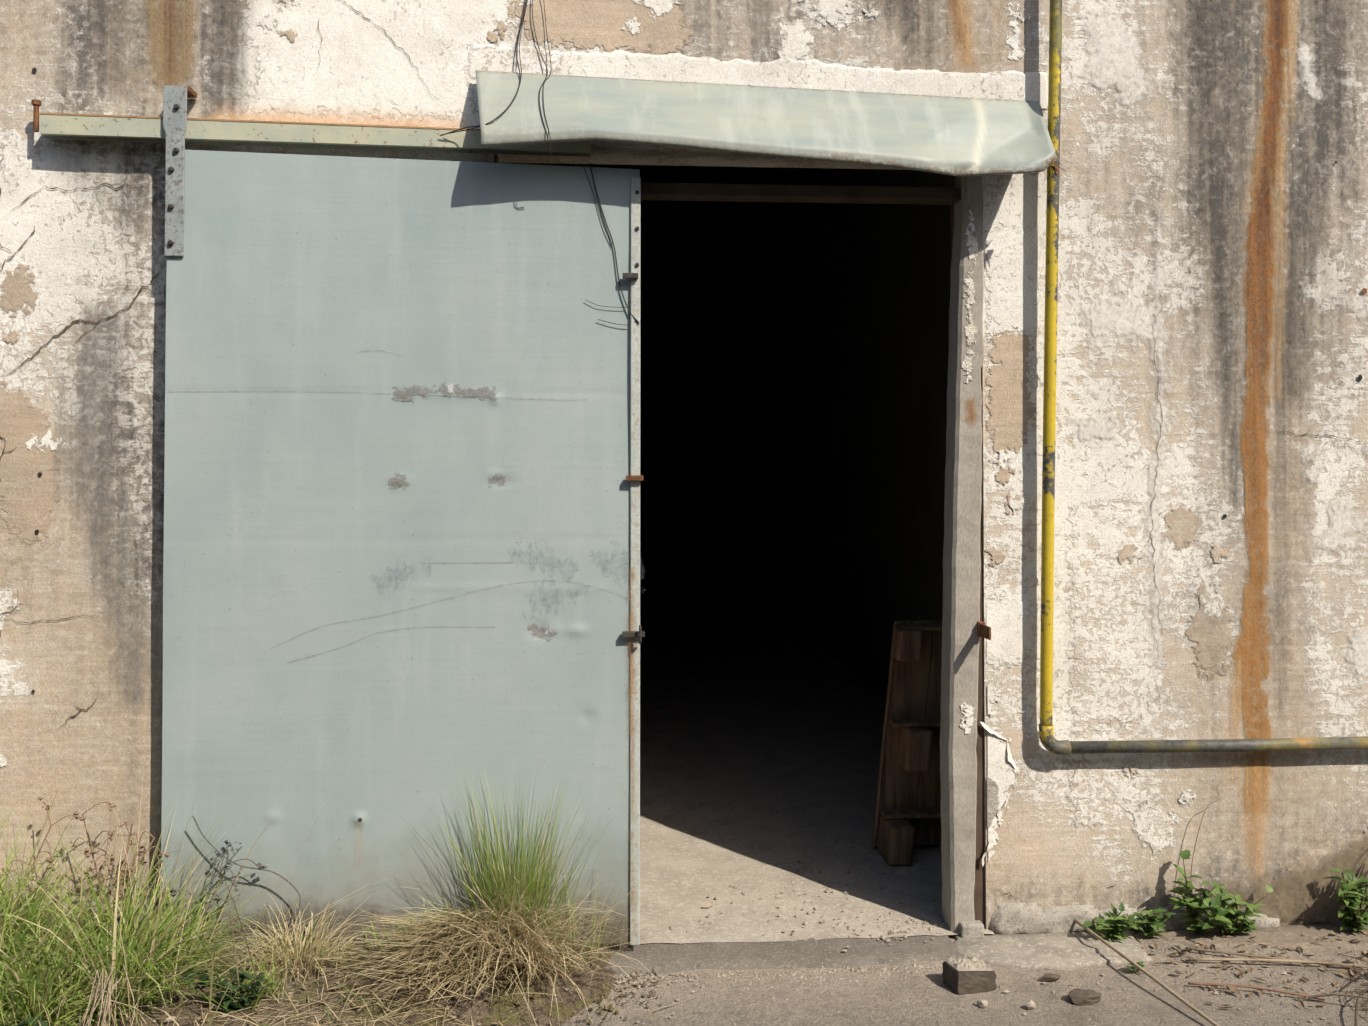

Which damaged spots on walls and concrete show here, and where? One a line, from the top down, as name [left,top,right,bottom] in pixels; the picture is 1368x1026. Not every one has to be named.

crack [317,1,433,96]
peeling [774,0,881,61]
crack [0,144,157,272]
peeling [0,263,41,344]
crack [1,273,159,377]
peeling [961,210,1046,515]
peeling [1062,209,1235,738]
corrosion [1232,0,1296,858]
peeling [985,546,1007,566]
peeling [0,586,24,631]
peeling [960,574,1040,869]
peeling [1066,754,1196,857]